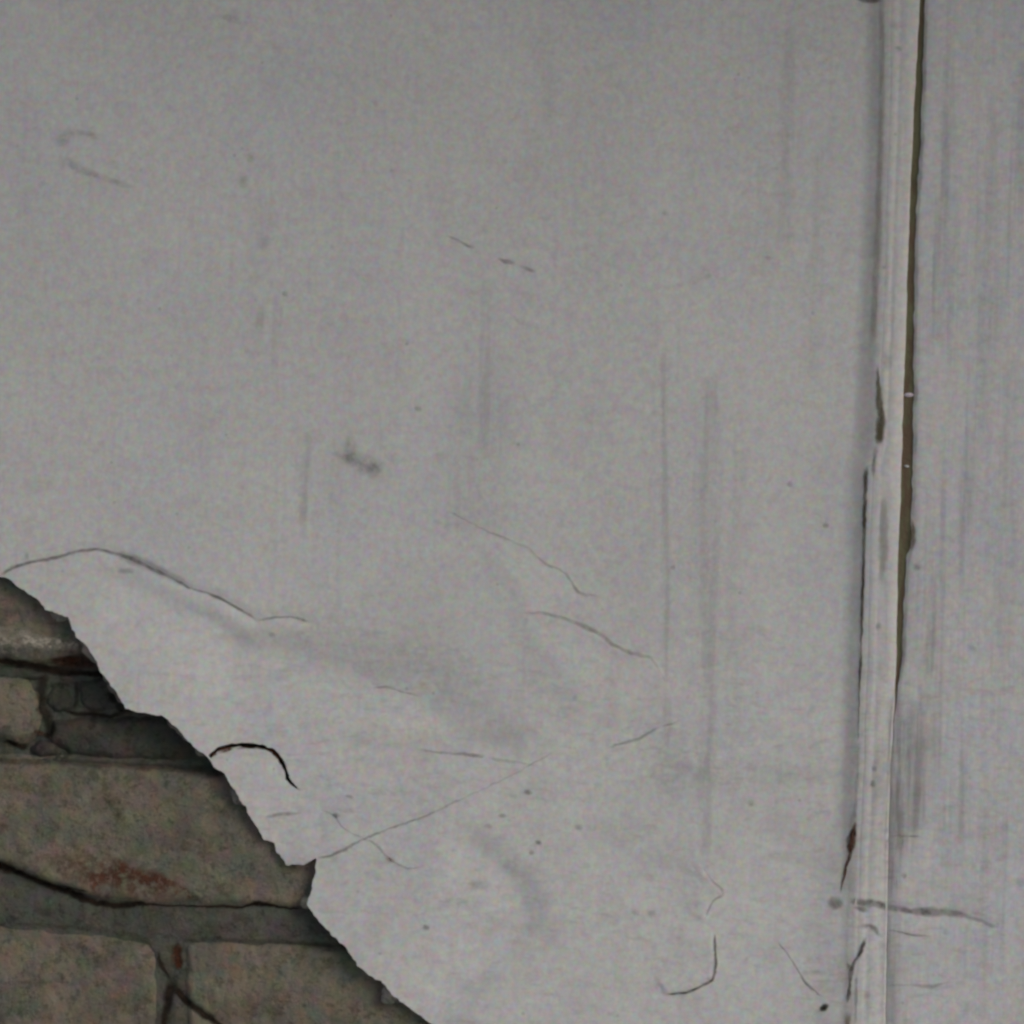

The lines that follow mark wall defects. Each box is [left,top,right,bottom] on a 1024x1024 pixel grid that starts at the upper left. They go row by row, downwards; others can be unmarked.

crack [206,743,297,788]
spalling [0,577,431,1024]
crack [902,907,931,915]